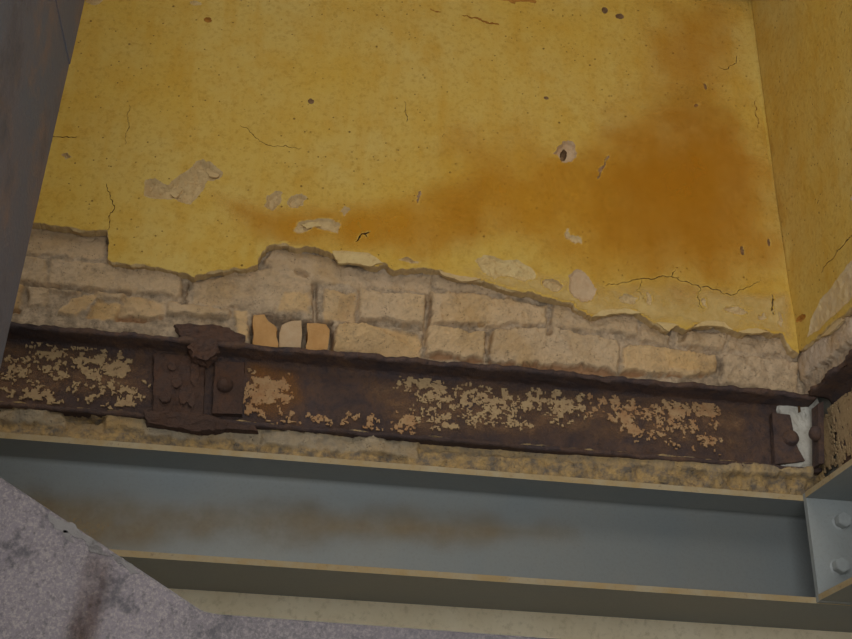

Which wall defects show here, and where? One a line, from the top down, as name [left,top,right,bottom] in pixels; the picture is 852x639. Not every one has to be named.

spalling [553,140,577,163]
flaking render [144,159,223,204]
flaking render [263,191,307,211]
flaking render [293,206,350,234]
flaking render [32,222,852,357]
leakage [530,279,785,330]
crack [605,269,774,315]